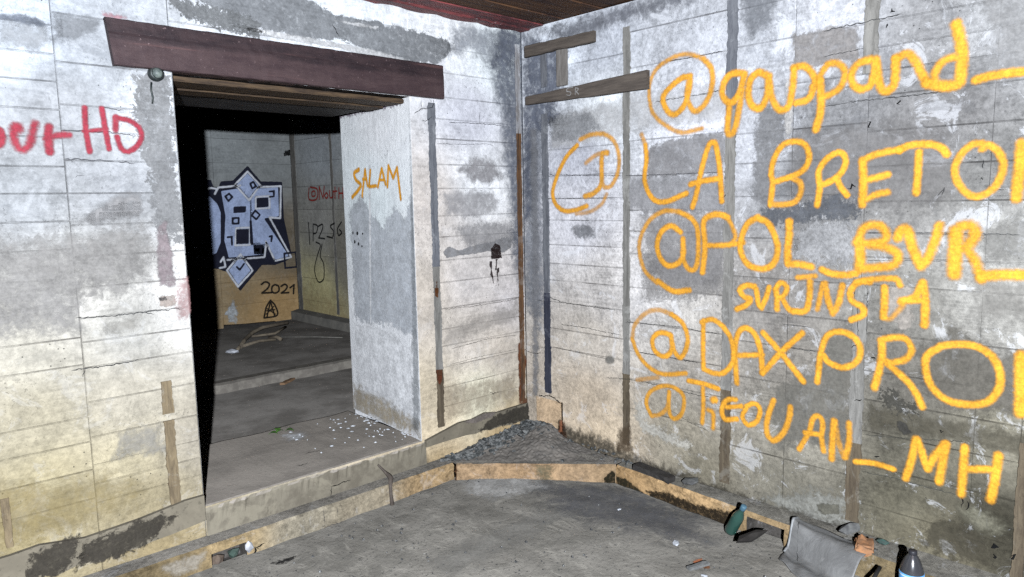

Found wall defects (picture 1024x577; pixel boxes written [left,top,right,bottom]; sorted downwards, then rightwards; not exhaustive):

damp [445,28,725,431]
crack [77,308,184,319]
crack [72,360,136,374]
damp [25,512,176,577]